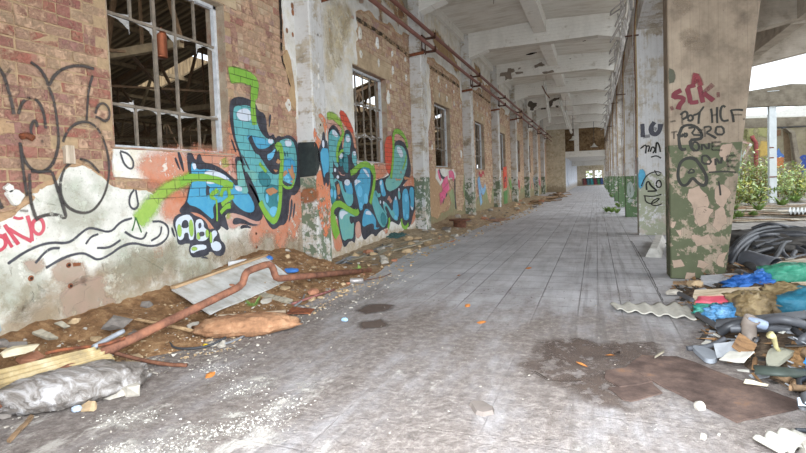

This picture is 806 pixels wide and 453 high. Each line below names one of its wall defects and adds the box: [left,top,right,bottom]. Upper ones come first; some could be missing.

crack [279,0,291,86]
peeling [707,144,732,172]
peeling [687,184,731,246]
flaking render [25,260,115,317]
peeling [672,252,727,279]
water stain [521,339,658,407]